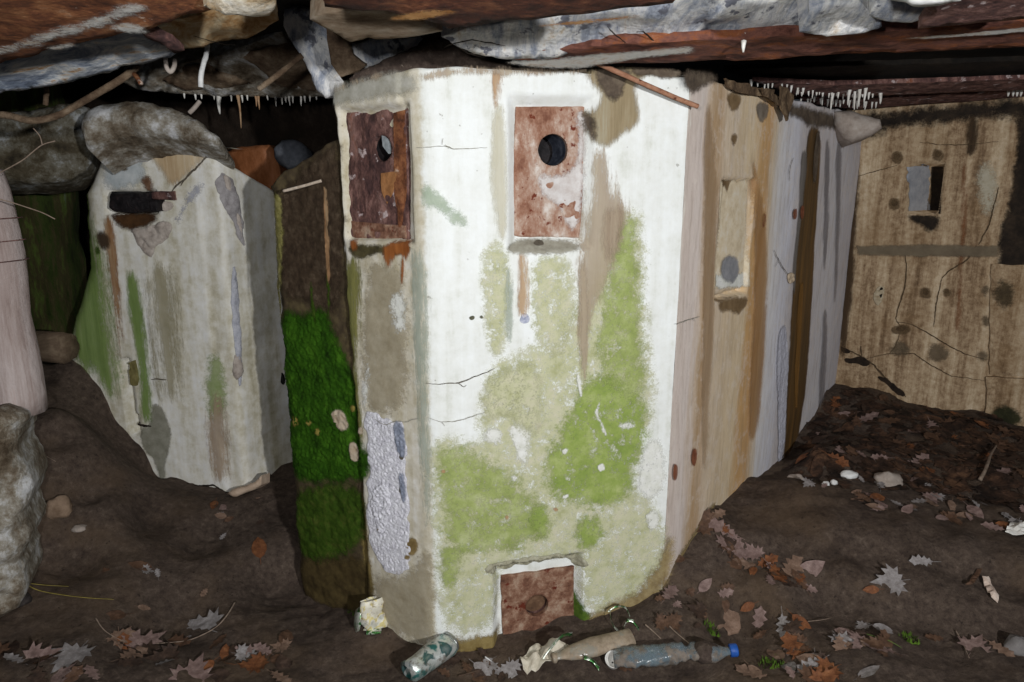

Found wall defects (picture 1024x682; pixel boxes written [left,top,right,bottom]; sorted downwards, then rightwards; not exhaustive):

rust [349,110,412,283]
crack [427,369,493,387]
water stain [756,98,1024,461]
crack [842,187,999,397]
peeling [331,410,411,575]